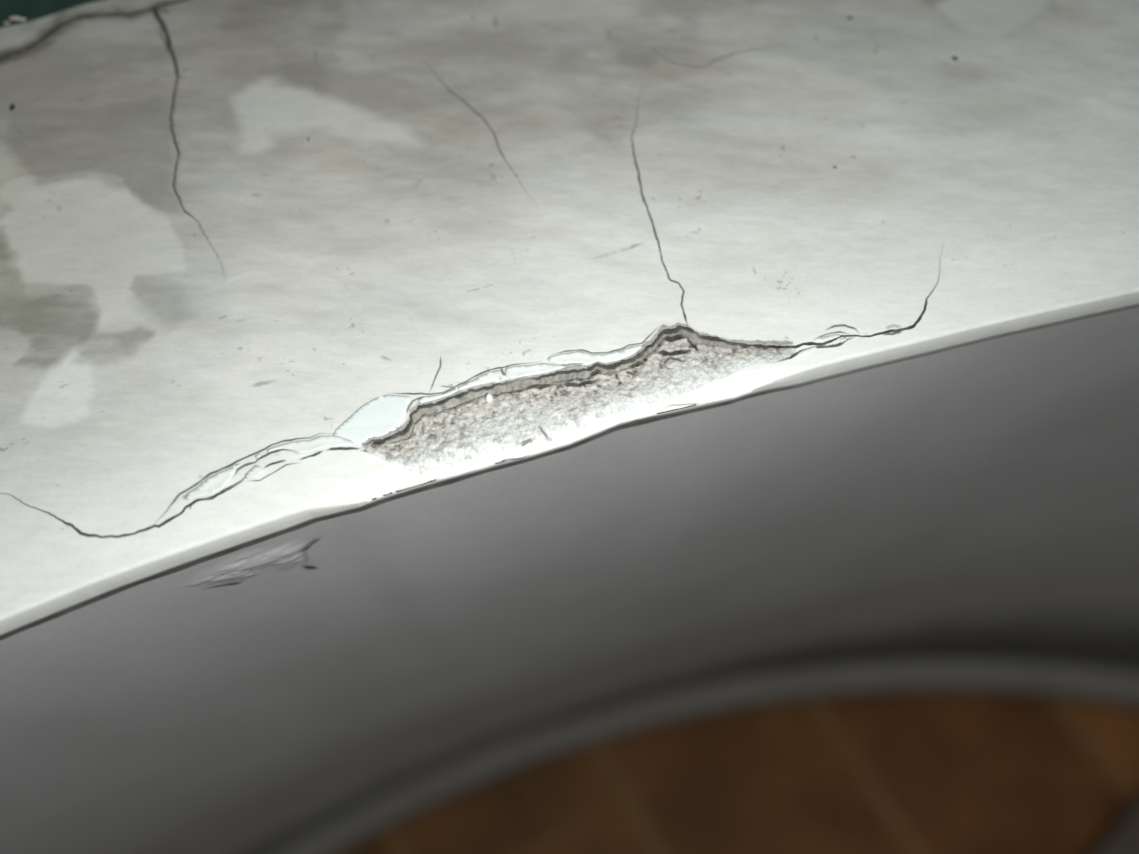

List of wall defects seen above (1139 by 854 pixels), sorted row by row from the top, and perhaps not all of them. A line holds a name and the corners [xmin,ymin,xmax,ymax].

crack [153,7,194,218]
crack [443,83,504,157]
crack [631,137,687,320]
spalling [332,325,795,475]
crack [771,291,933,359]
crack [0,386,795,640]